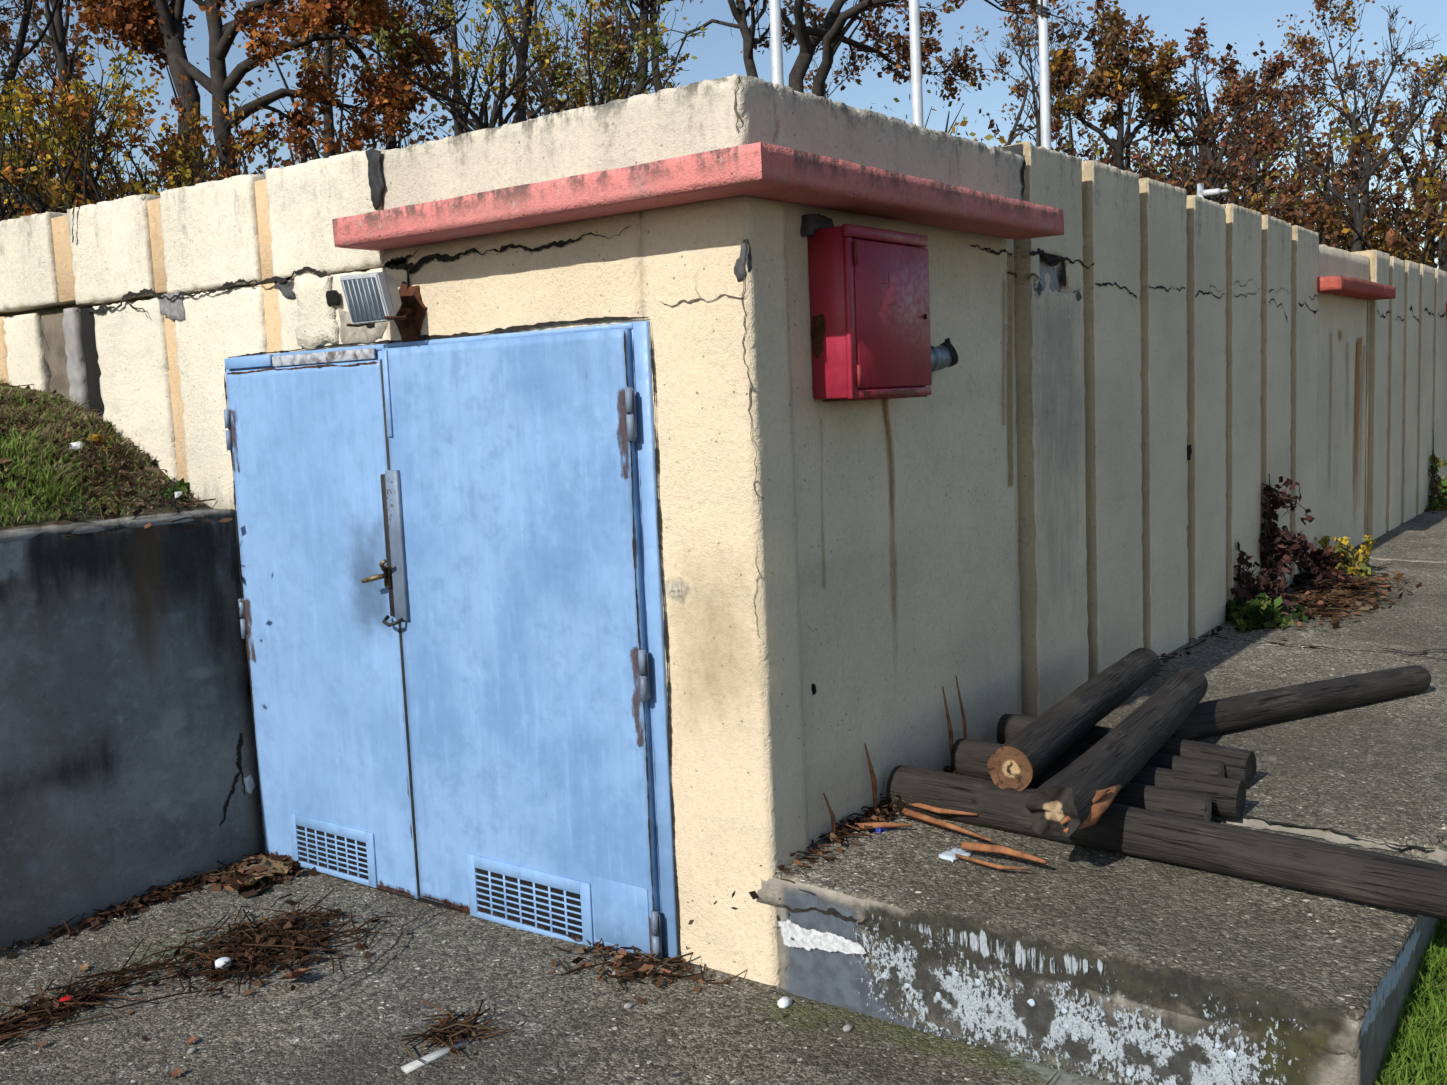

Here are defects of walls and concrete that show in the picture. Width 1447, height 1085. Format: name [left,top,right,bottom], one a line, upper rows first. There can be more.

crack [88,267,327,318]
crack [384,226,629,274]
spalling [1033,253,1082,301]
crack [970,244,1319,322]
rust [885,399,893,511]
rust [1340,331,1362,504]
leakage [0,510,240,651]
crack [219,733,245,828]
peeling [778,890,1305,1085]